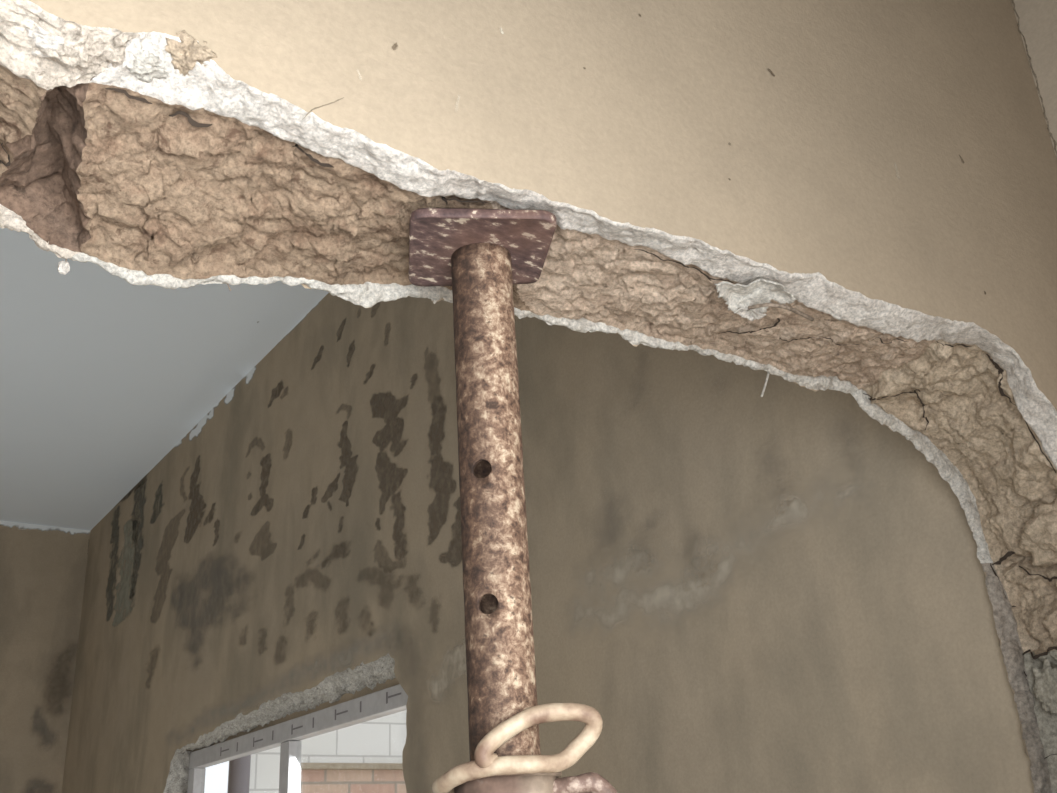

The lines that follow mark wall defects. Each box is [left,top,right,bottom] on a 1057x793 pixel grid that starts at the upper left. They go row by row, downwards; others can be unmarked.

crack [1011,0,1057,153]
spalling [0,0,943,342]
spalling [513,225,1057,793]
crack [990,551,1057,607]
spalling [164,653,396,793]